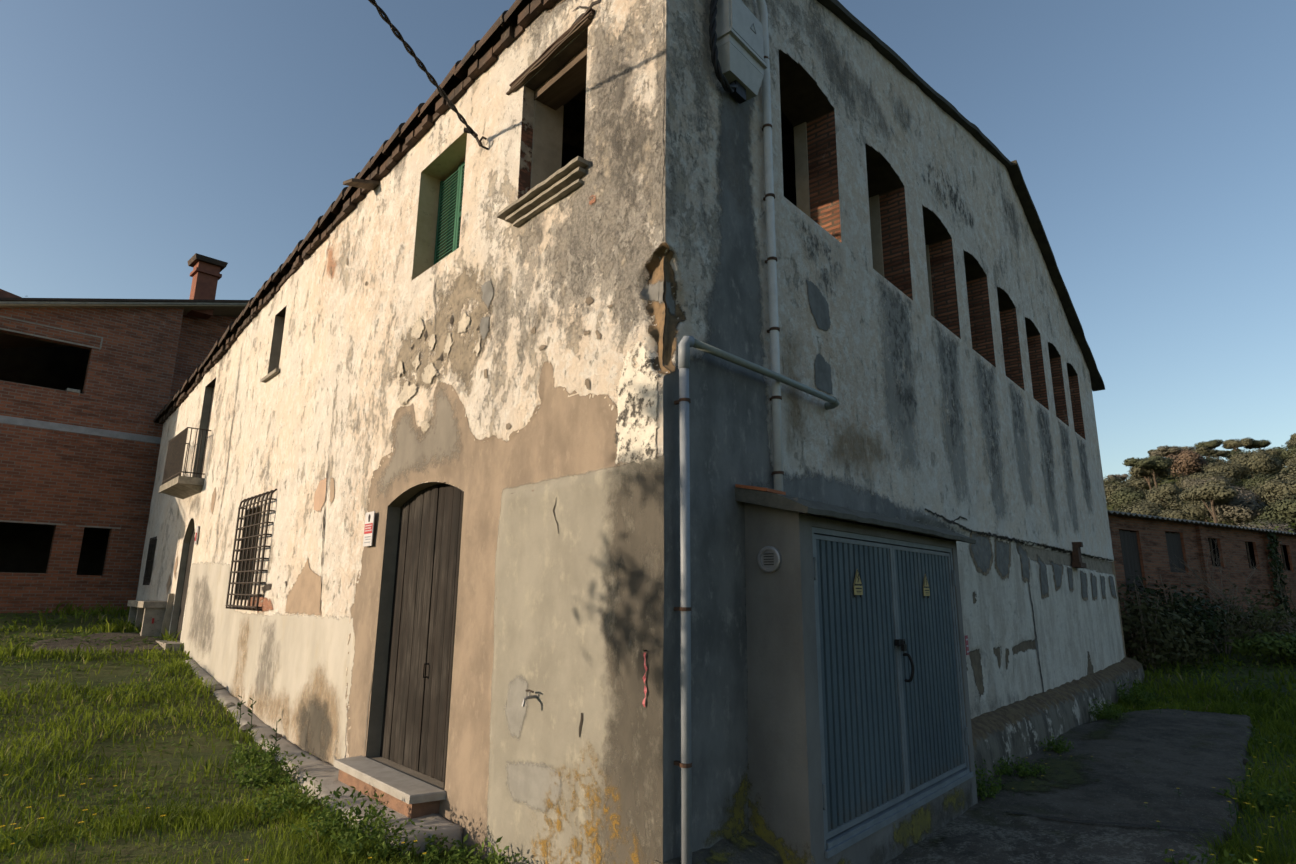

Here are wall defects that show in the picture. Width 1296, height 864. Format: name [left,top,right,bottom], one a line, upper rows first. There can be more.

flaking render [247,559,322,615]
flaking render [345,242,686,860]
flaking render [970,531,1117,601]
leakage [233,628,337,763]
spalling [969,639,1037,697]